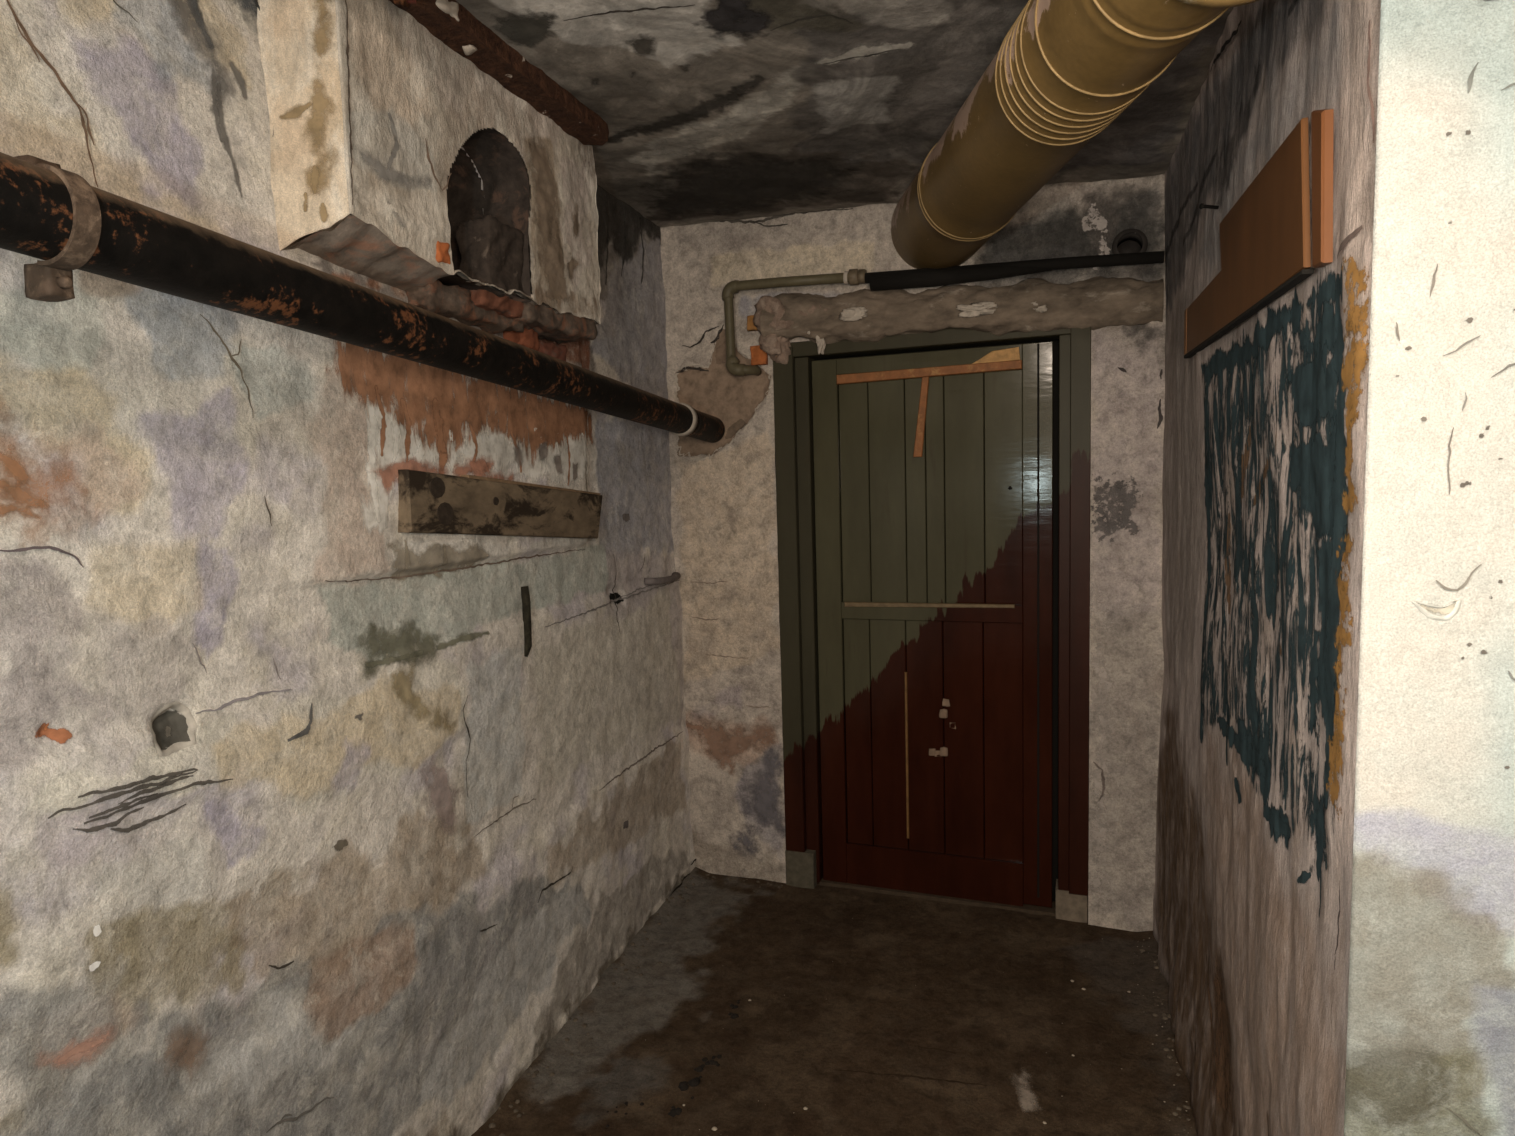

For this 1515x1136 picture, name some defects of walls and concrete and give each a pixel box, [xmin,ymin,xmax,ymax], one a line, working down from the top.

crack [6,0,99,188]
leakage [496,13,556,48]
leakage [701,0,772,39]
rust [326,340,593,490]
leakage [529,141,579,303]
spalling [673,315,773,461]
leakage [605,75,857,284]
crack [1430,264,1438,296]
crack [1443,336,1480,356]
crack [1448,363,1515,495]
peeling [1200,256,1370,917]
hole [149,702,197,757]